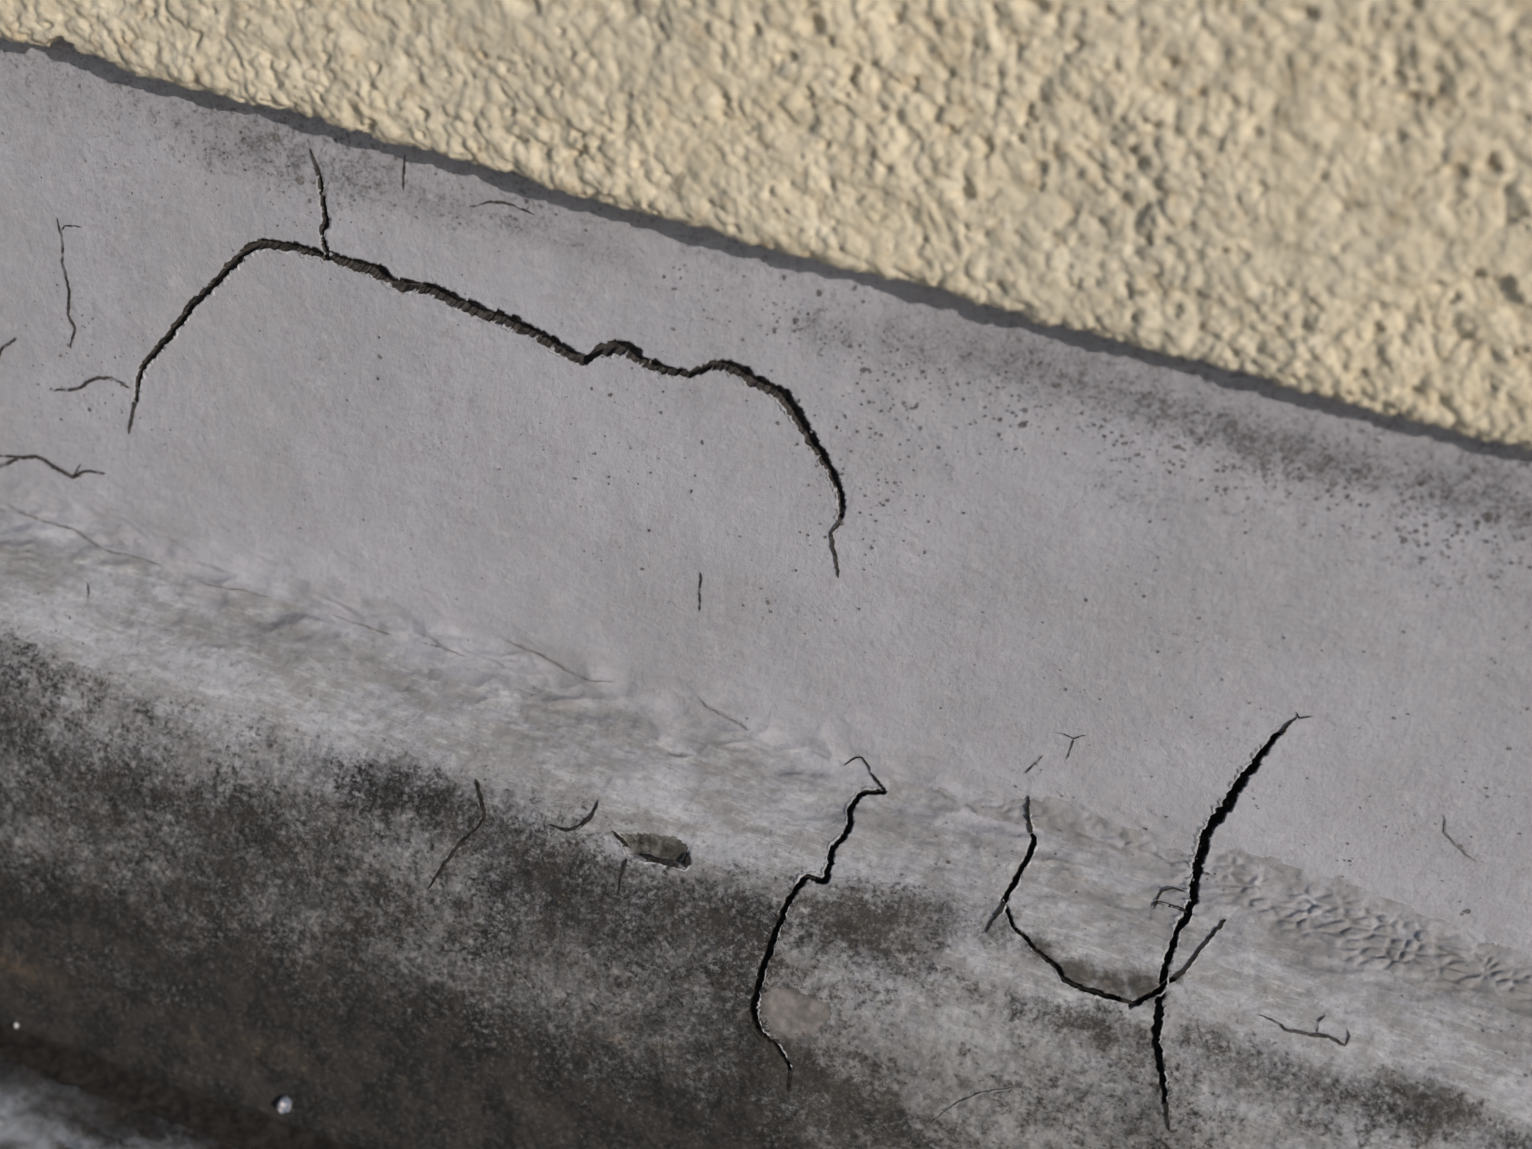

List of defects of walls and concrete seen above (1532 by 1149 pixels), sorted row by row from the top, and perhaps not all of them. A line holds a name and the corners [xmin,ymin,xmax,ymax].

damp [161,108,464,234]
crack [0,455,106,480]
crack [16,511,160,595]
damp [26,272,171,446]
crack [54,148,845,578]
damp [656,247,1532,634]
crack [427,779,486,890]
spalling [620,832,688,864]
damp [0,632,1532,1149]
crack [749,756,886,1093]
crack [985,712,1314,1131]
crack [1258,1014,1351,1046]